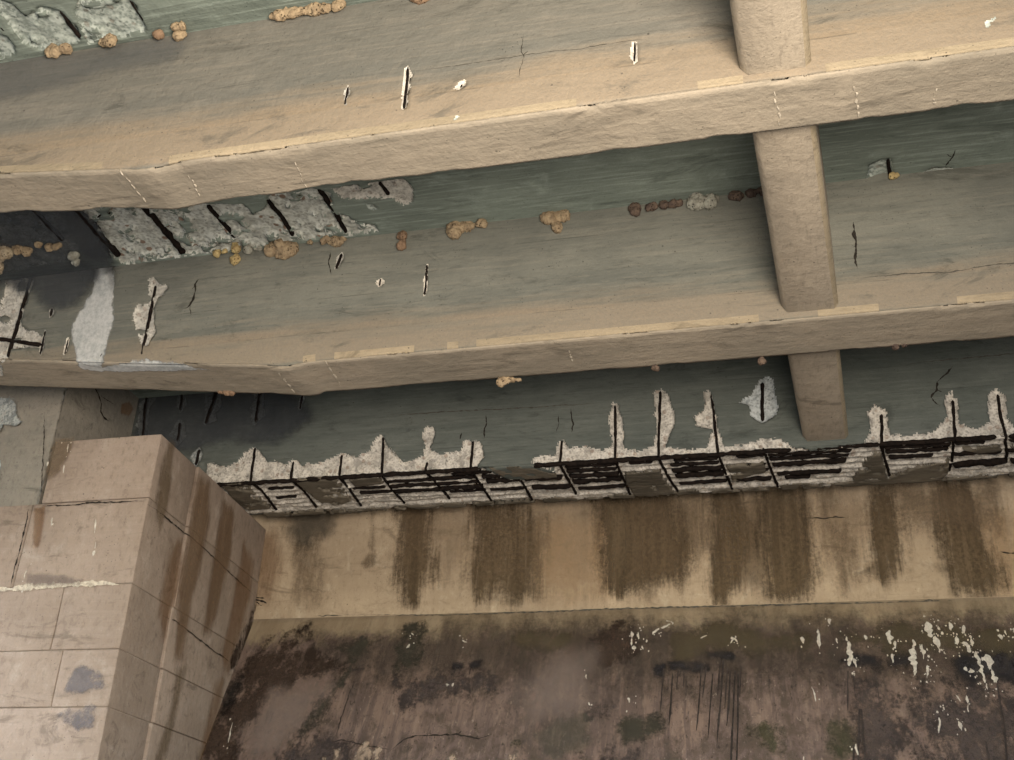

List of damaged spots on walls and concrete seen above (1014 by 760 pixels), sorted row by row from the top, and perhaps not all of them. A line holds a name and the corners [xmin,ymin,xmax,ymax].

spalling [0,0,147,60]
damp [0,210,114,308]
spalling [75,178,414,265]
spalling [0,283,46,376]
spalling [133,277,168,354]
spalling [739,376,779,423]
spalling [190,388,1014,518]
damp [393,508,437,608]
damp [468,503,550,605]
damp [711,488,820,605]
damp [869,480,1008,597]
damp [201,605,1014,760]